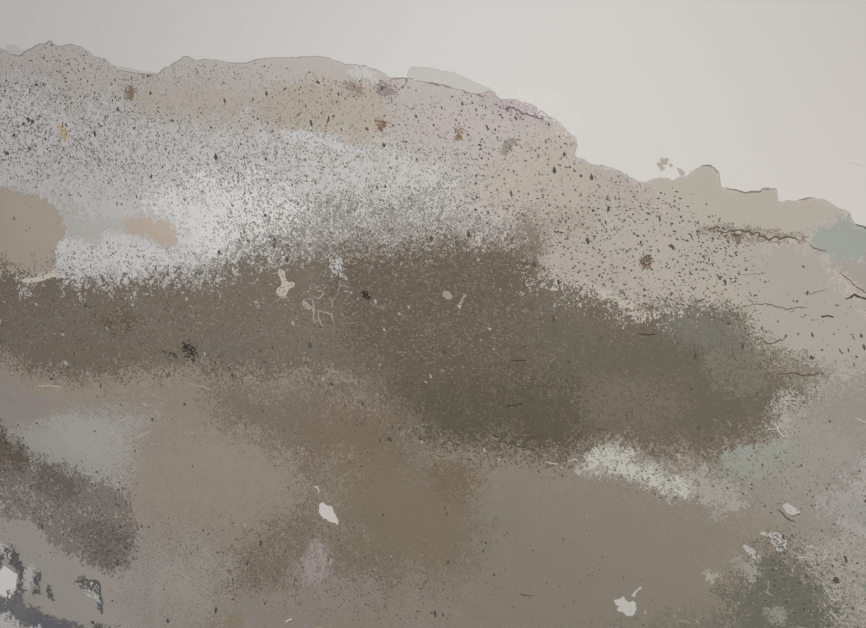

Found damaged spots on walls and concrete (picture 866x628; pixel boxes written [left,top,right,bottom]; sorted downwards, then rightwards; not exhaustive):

flaking render [0,41,866,349]
crack [709,226,826,252]
crack [744,273,866,318]